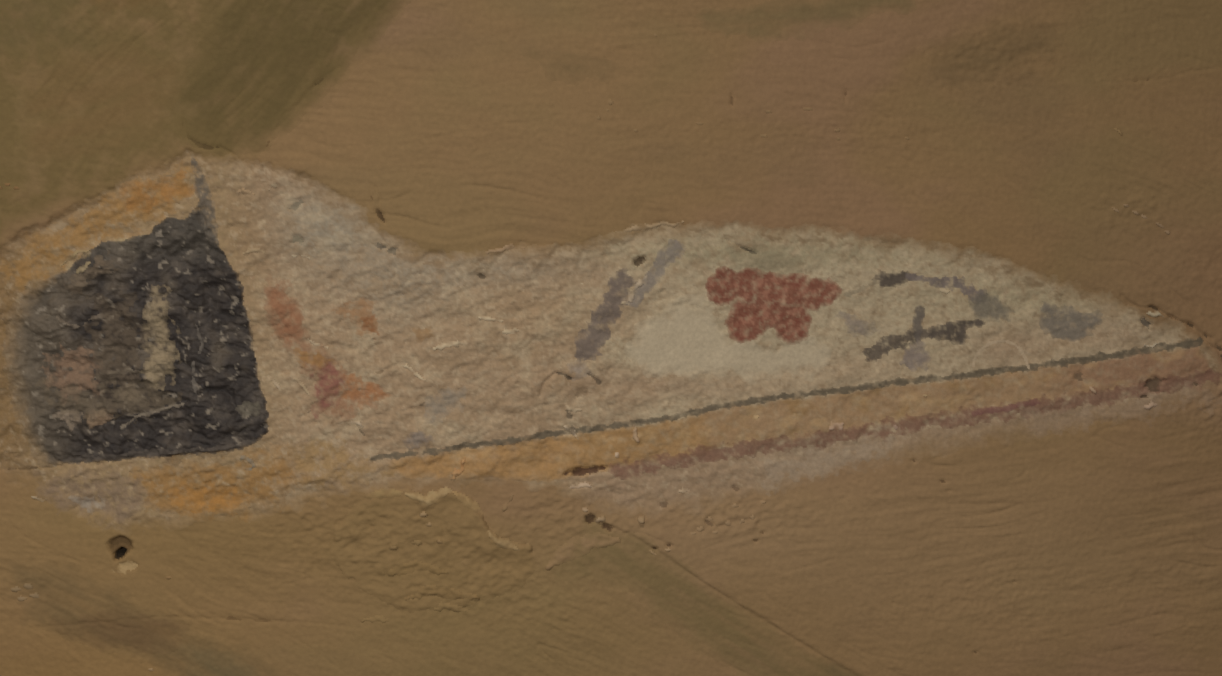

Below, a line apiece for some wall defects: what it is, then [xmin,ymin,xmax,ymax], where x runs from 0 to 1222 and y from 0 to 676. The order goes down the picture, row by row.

flaking render [621,256,648,306]
flaking render [1140,305,1170,329]
peeling [35,250,204,432]
peeling [235,401,261,419]
spalling [1140,376,1163,409]
spalling [564,452,620,489]